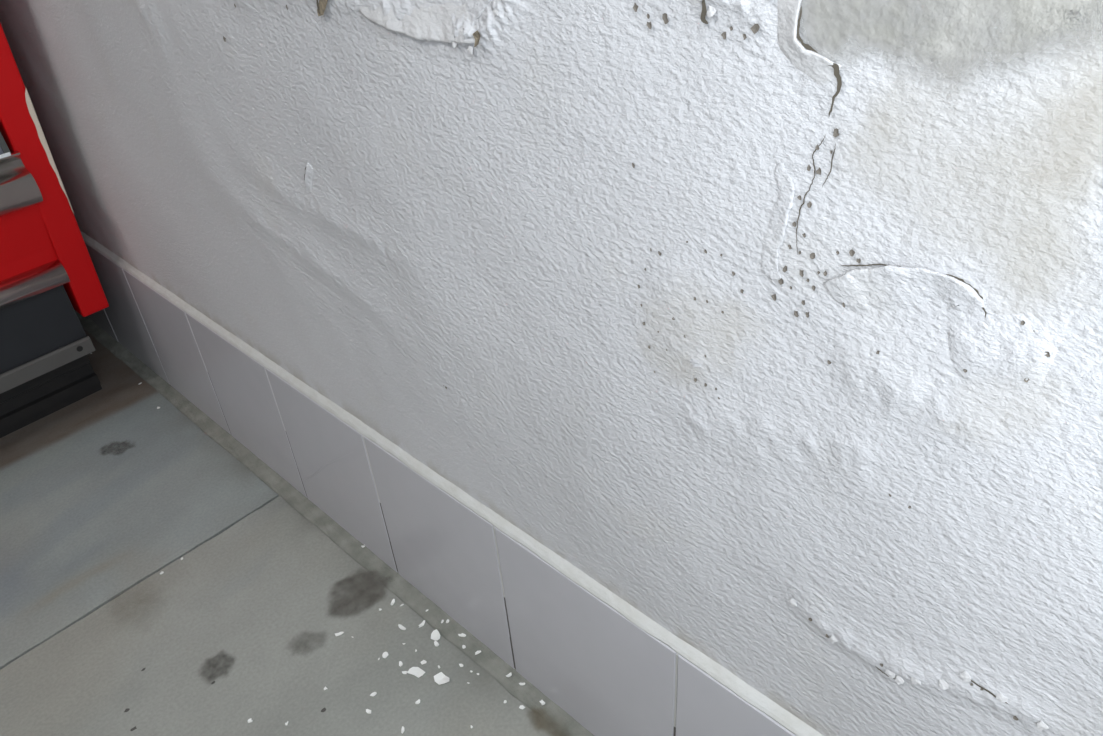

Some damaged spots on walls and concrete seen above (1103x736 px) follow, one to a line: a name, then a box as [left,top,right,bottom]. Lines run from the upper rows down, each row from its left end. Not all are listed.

spalling [633,3,669,29]
spalling [686,0,1103,85]
crack [761,7,861,318]